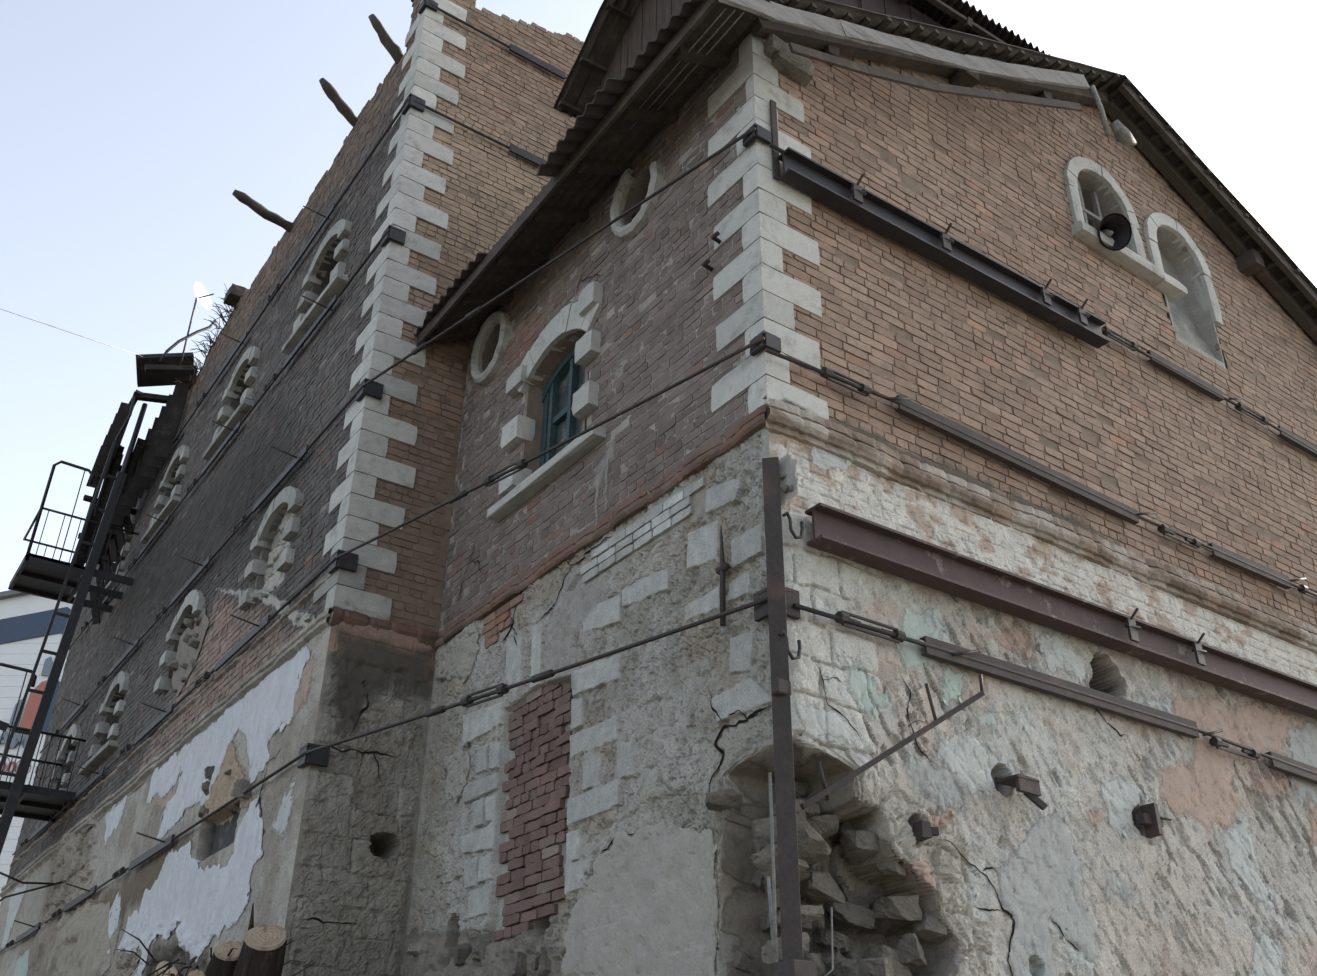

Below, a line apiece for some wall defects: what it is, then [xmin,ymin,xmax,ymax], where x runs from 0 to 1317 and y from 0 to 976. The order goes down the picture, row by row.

spalling [166,607,209,696]
spalling [216,588,315,627]
crack [708,689,772,793]
peeling [104,647,310,976]
flaking render [399,761,782,976]
spalling [793,701,959,976]
crack [938,839,1015,976]
crack [1051,919,1080,952]